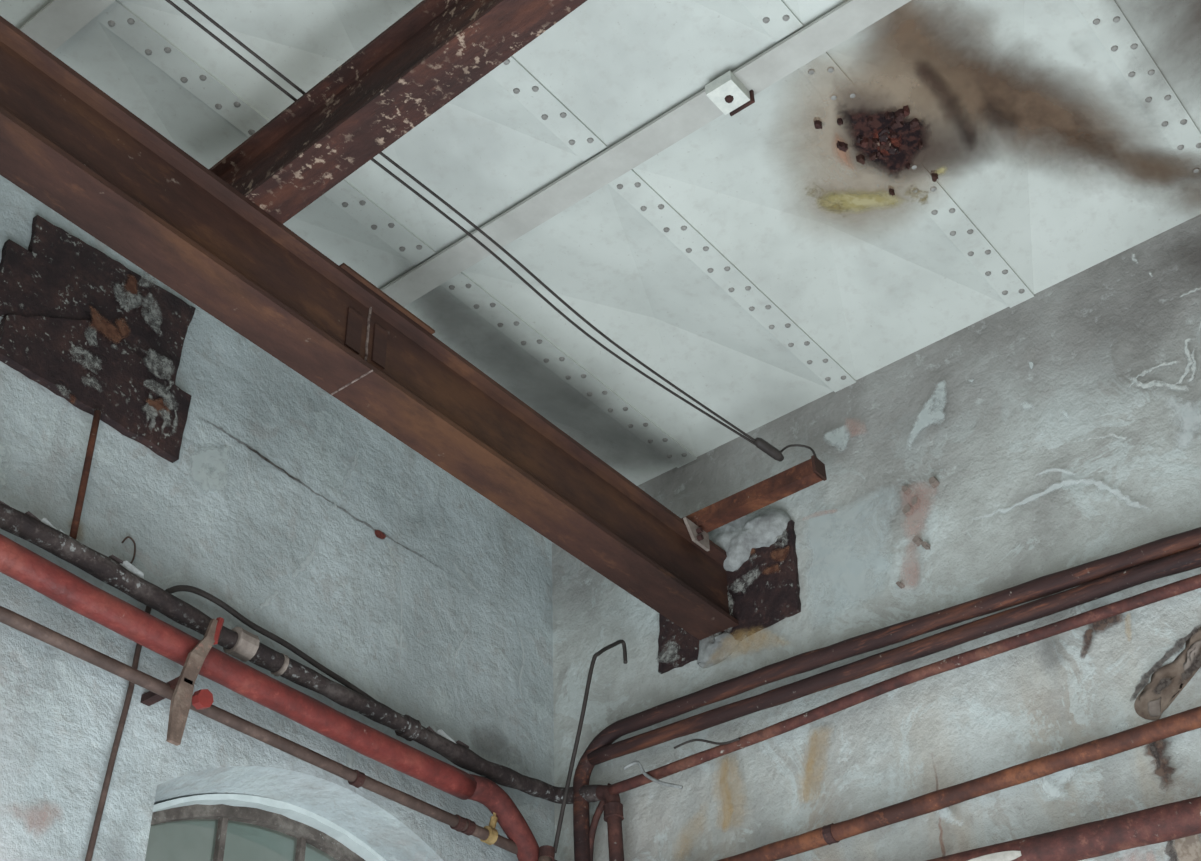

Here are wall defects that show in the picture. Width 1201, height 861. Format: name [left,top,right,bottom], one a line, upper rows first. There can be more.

water stain [874,1,1201,184]
crack [207,421,421,556]
flaking render [1131,625,1201,720]
peeling [1042,764,1085,797]
flaking render [1146,740,1175,787]
flaking render [1165,834,1201,861]